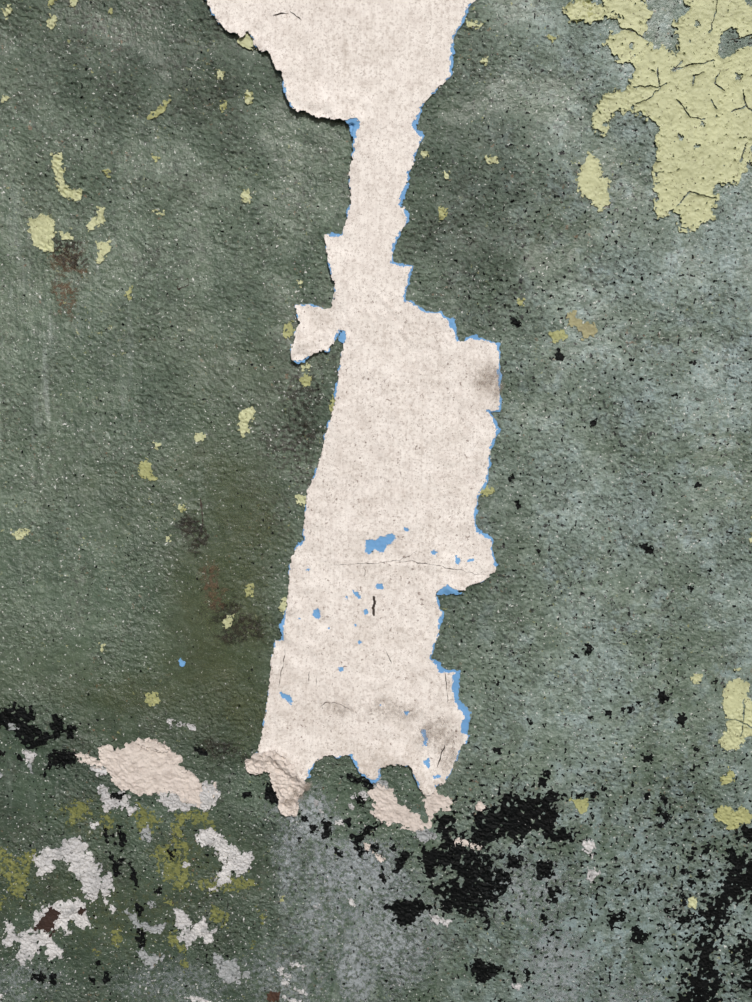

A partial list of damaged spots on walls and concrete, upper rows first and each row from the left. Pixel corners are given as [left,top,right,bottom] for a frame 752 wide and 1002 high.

crack [638,62,750,120]
peeling [50,152,83,201]
peeling [27,213,57,253]
peeling [86,206,112,264]
peeling [207,0,612,937]
peeling [0,701,79,761]
peeling [644,792,674,828]
peeling [55,799,139,888]
peeling [130,802,258,929]
peeling [135,903,147,948]
peeling [656,804,752,1002]
peeling [27,969,57,985]